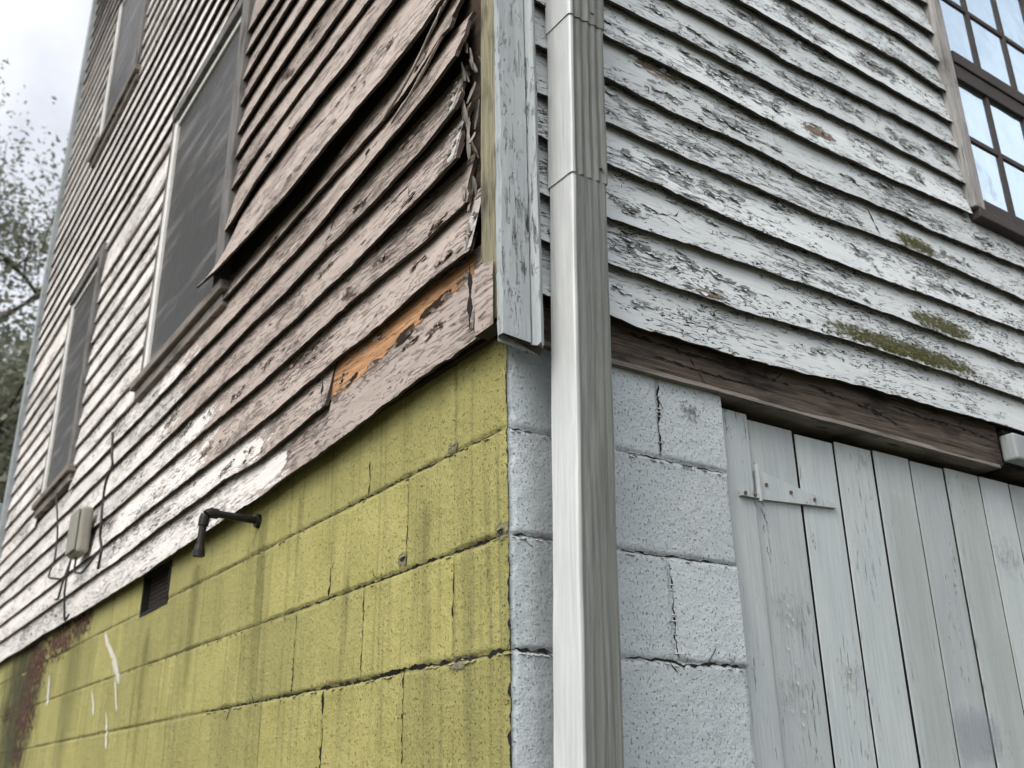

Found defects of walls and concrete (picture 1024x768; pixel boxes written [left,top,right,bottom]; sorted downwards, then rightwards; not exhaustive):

peeling [629,55,693,105]
peeling [674,43,781,114]
peeling [801,120,836,144]
peeling [647,156,746,208]
peeling [676,249,757,300]
peeling [330,249,477,400]
crack [629,333,992,439]
peeling [180,407,214,462]
peeling [218,436,288,490]
crack [618,385,726,475]
crack [621,549,746,673]
damp [0,645,37,768]